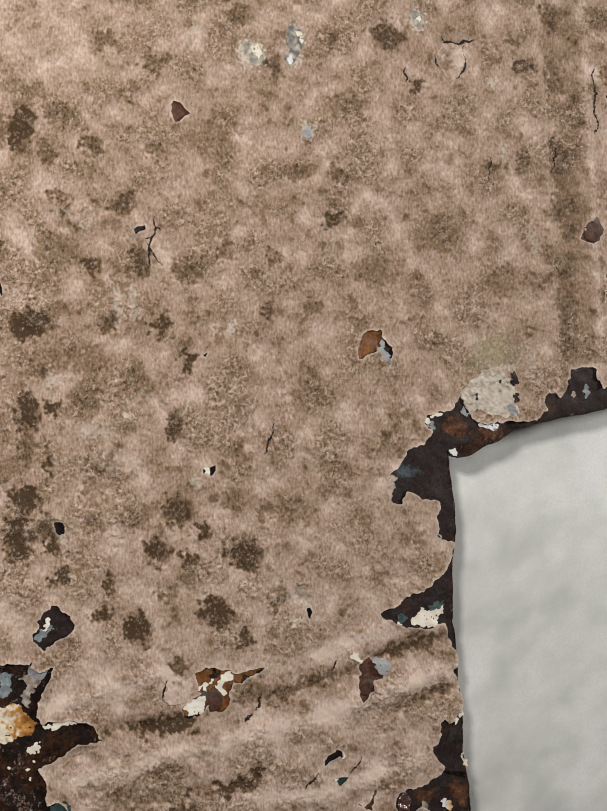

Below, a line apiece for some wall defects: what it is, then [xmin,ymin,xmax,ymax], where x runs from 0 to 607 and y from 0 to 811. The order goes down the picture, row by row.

crack [435,37,473,78]
peeling [64,198,102,231]
peeling [539,367,607,420]
peeling [388,371,520,541]
peeling [54,522,64,535]
peeling [32,606,75,651]
peeling [381,562,455,649]
peeling [164,667,264,719]
peeling [350,652,392,703]
peeling [0,663,102,811]
peeling [396,710,468,811]